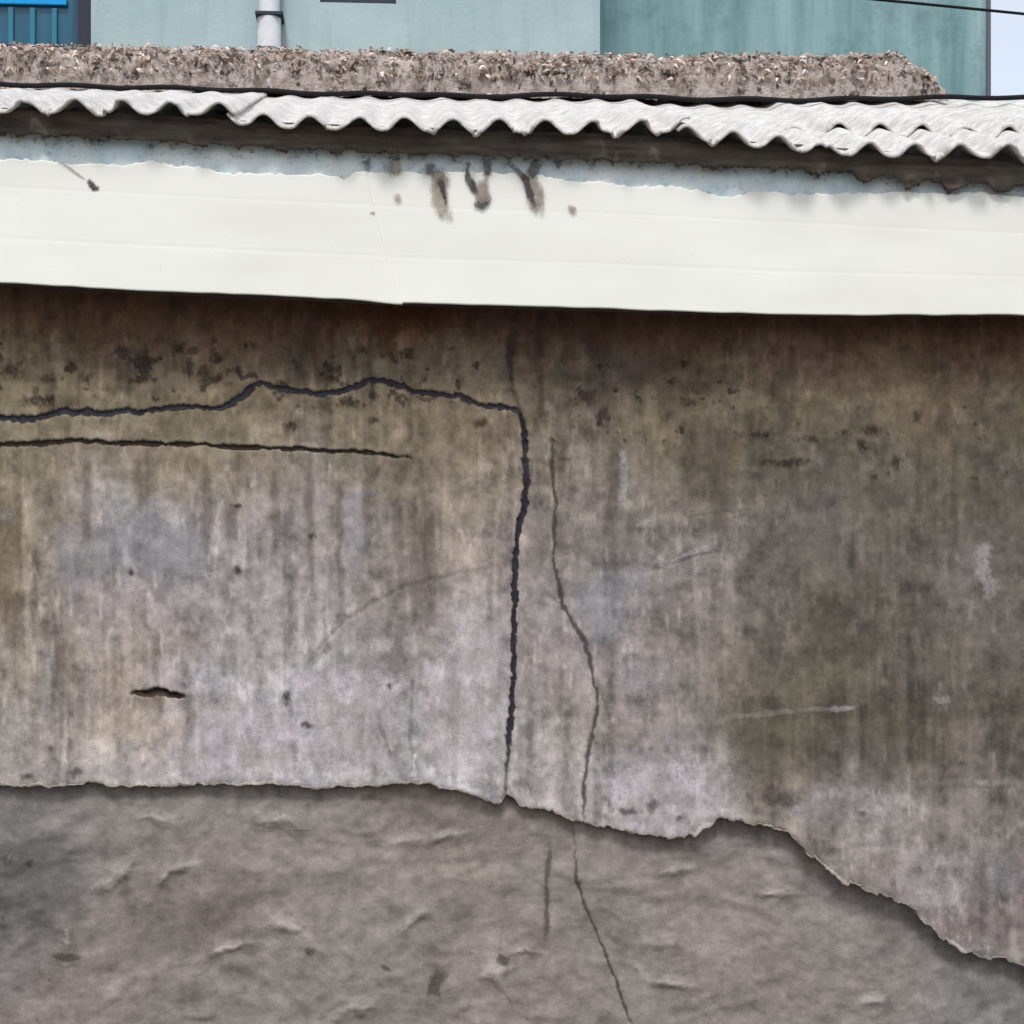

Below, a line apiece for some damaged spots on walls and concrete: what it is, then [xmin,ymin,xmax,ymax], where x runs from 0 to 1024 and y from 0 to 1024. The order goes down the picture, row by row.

leakage [24,362,88,404]
leakage [114,340,242,392]
leakage [317,356,376,406]
leakage [619,439,628,500]
crack [0,342,599,815]
peeling [0,618,1024,967]
crack [543,857,551,929]
crack [575,867,631,1021]